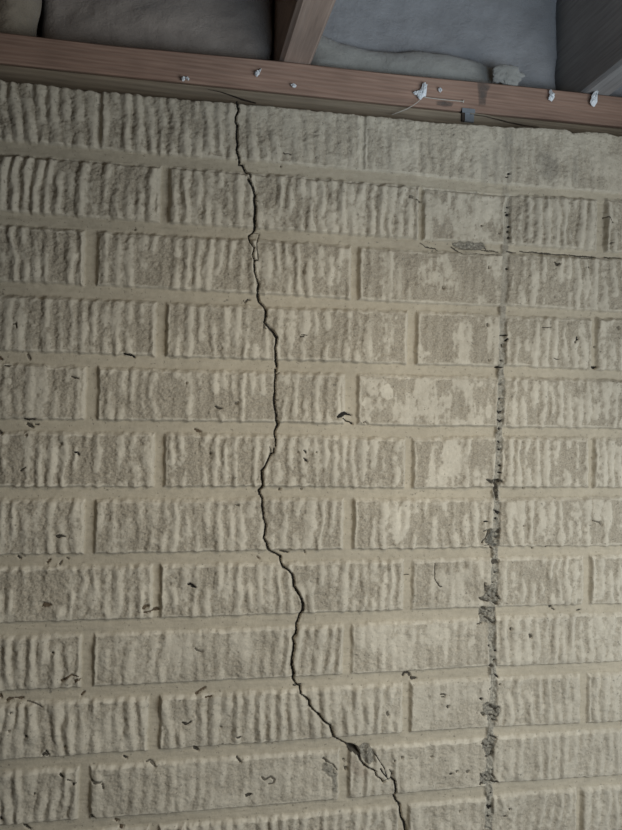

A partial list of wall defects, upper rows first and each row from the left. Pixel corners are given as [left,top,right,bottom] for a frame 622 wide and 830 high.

crack [234,101,406,830]